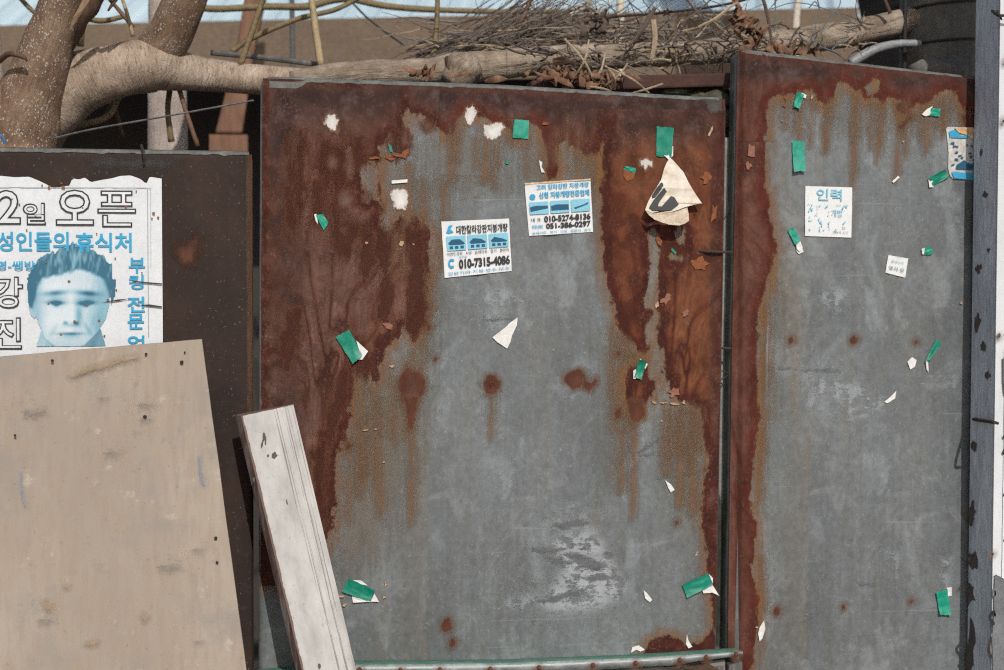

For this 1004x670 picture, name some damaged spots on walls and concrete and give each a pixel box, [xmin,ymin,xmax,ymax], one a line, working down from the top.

corrosion [249,52,975,670]